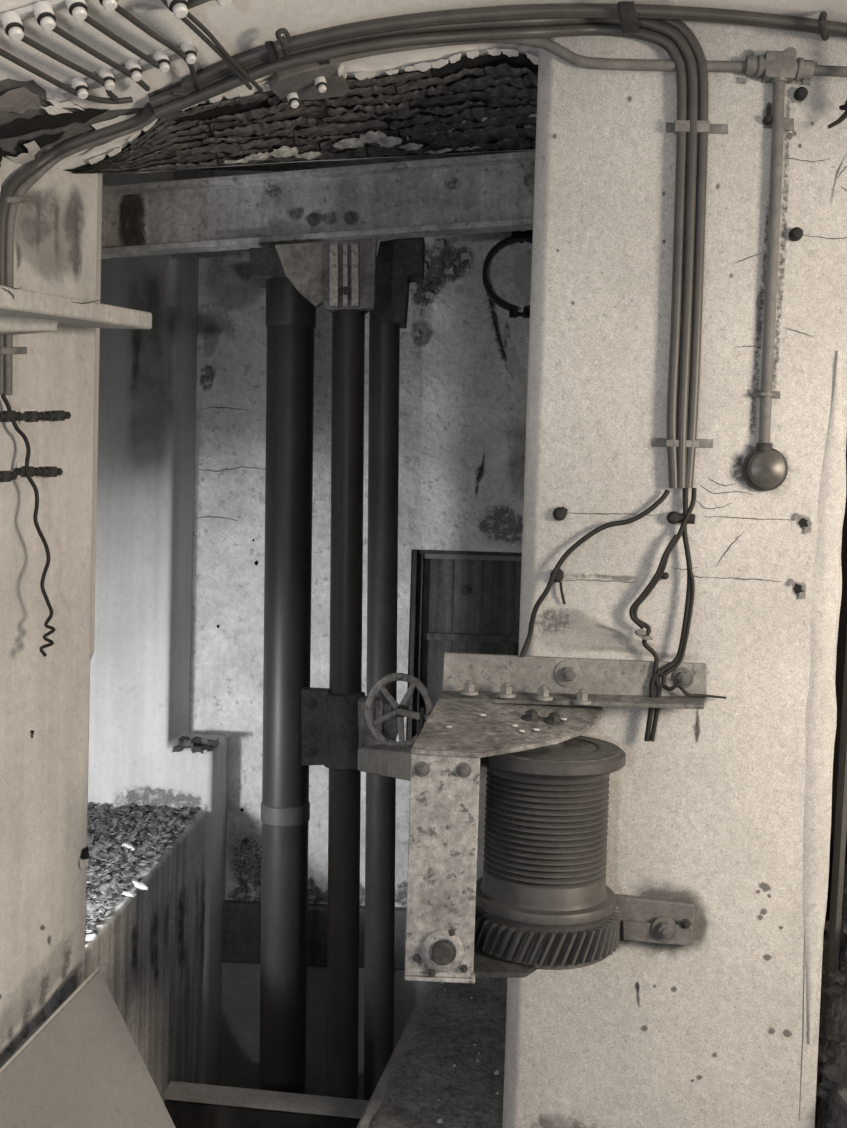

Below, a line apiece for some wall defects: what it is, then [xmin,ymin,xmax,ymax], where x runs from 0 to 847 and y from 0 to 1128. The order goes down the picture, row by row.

spalling [0,78,143,196]
spalling [63,48,539,174]
leakage [25,194,83,267]
corrosion [733,176,788,480]
leakage [479,507,523,543]
crack [574,510,654,518]
crack [672,479,794,582]
leakage [648,891,691,902]
leakage [756,883,771,920]
leakage [0,950,82,1058]